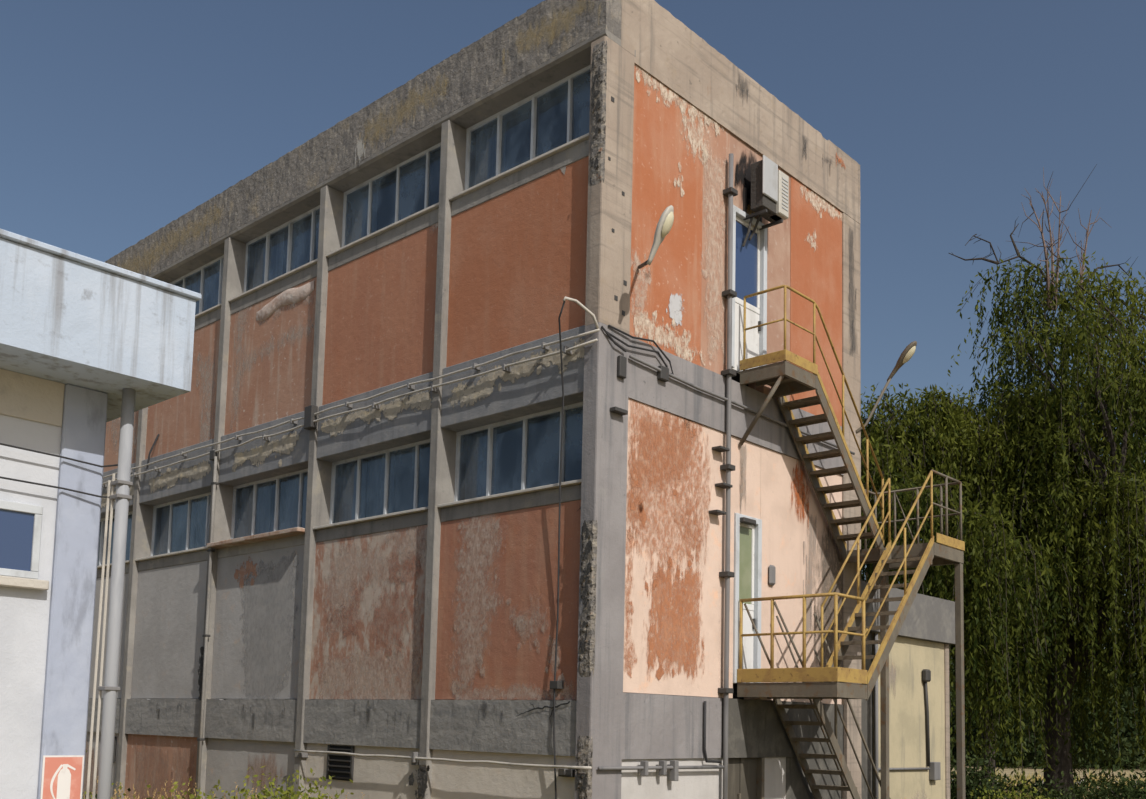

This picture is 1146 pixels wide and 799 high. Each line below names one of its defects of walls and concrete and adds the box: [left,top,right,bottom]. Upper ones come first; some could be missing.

spalling [458,40,607,199]
peeling [631,65,727,365]
peeling [800,186,842,220]
peeling [452,515,598,700]
peeling [625,402,710,680]
corrosion [791,465,810,525]